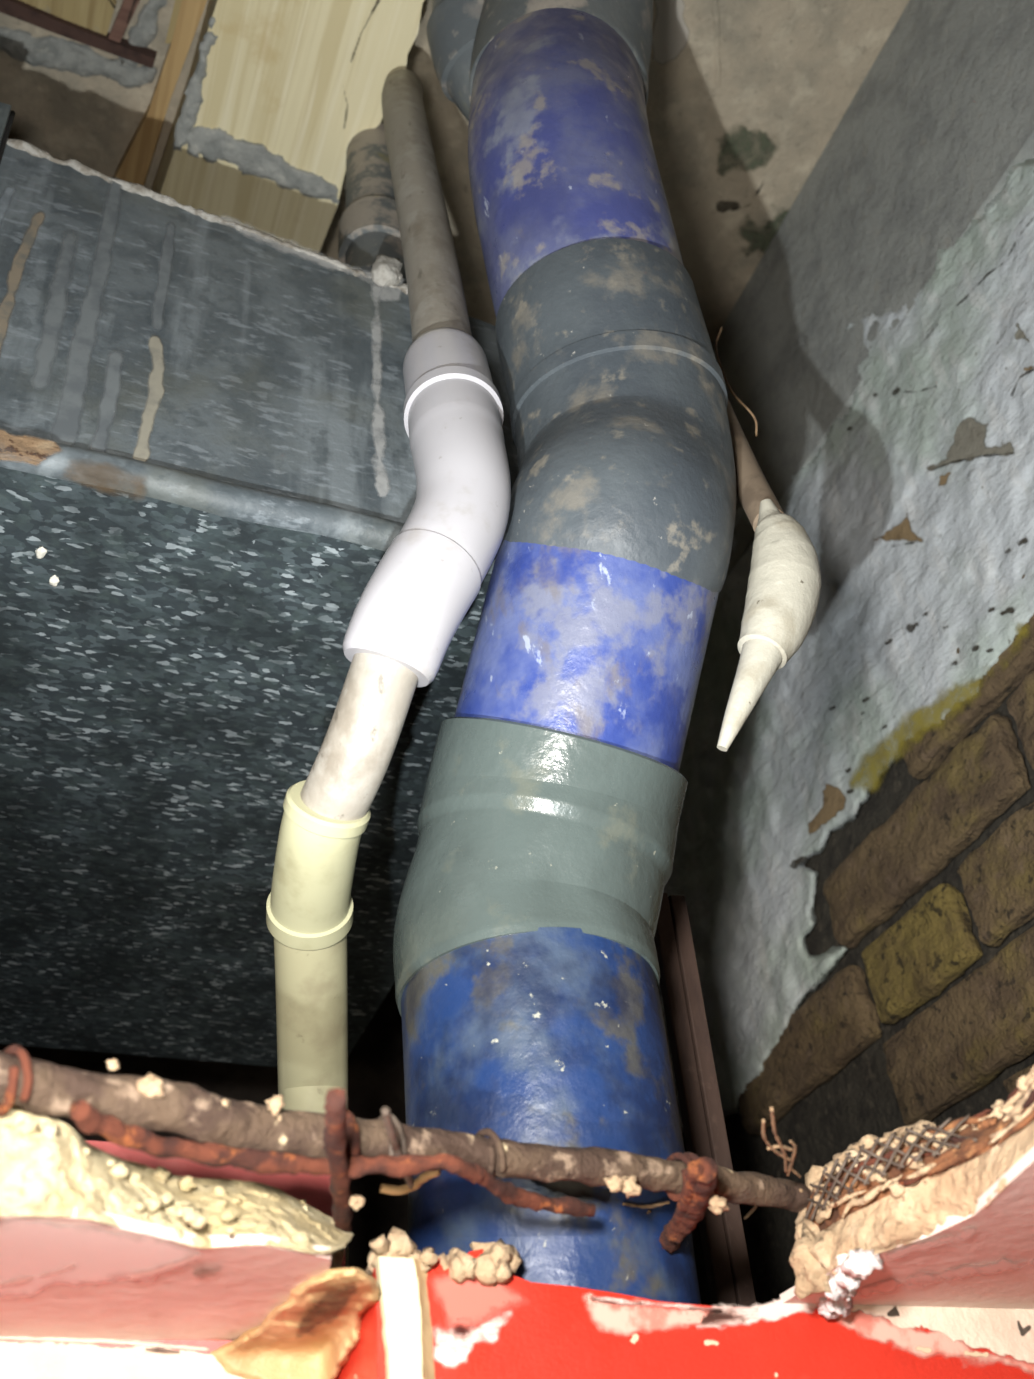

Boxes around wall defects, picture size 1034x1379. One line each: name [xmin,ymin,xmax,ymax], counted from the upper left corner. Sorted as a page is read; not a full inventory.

water stain [0,212,45,349]
water stain [32,181,123,452]
water stain [133,223,175,462]
rust [0,430,61,465]
peeling [927,418,1014,486]
water stain [850,679,981,791]
spalling [585,607,1034,1346]
peeling [0,1341,244,1379]
water stain [298,1285,356,1336]